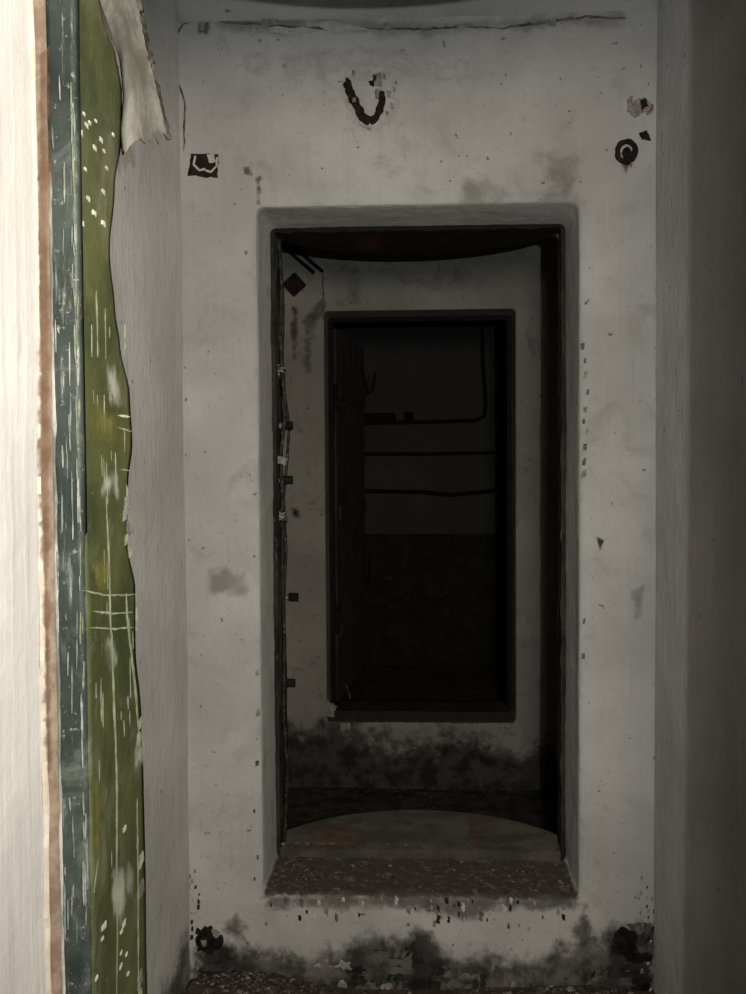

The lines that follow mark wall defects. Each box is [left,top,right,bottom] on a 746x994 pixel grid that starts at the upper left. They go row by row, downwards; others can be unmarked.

crack [178,15,626,39]
peeling [99,0,171,155]
crack [178,85,186,147]
spalling [627,95,653,118]
damp [287,718,530,791]
peeling [189,869,220,947]
damp [165,916,654,994]